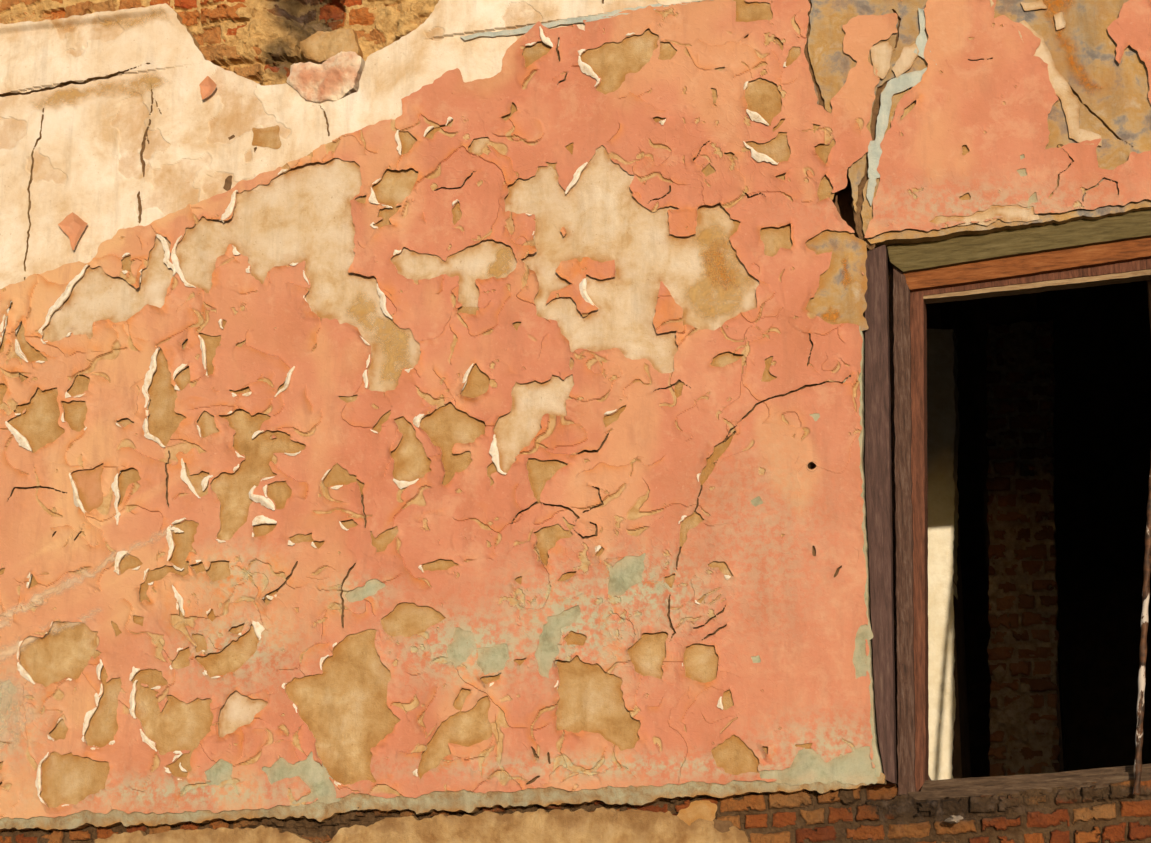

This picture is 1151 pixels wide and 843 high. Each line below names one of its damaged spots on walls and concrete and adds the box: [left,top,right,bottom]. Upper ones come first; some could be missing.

crack [0,52,168,282]
peeling [0,0,1151,505]
crack [951,52,1021,67]
crack [1042,56,1141,210]
flaking render [0,313,1151,843]